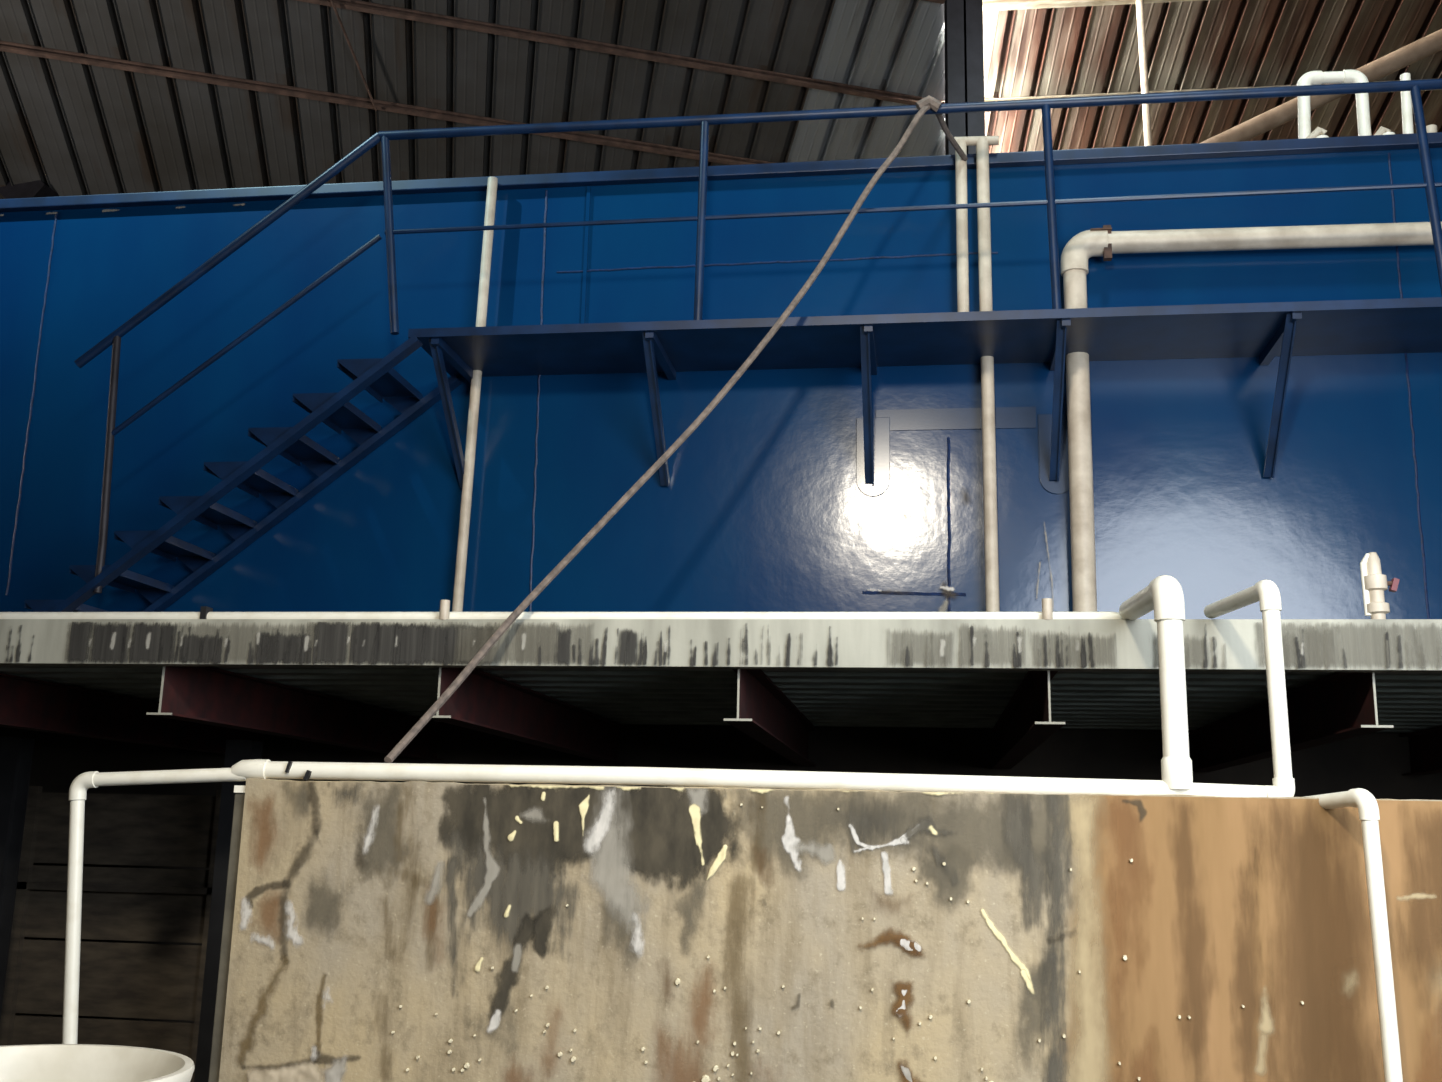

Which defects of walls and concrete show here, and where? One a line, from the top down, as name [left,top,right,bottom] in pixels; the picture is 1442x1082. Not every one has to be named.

damp [67,622,670,666]
damp [690,624,838,666]
damp [892,626,1115,668]
damp [1184,633,1226,668]
damp [1256,622,1266,664]
damp [1282,623,1442,668]
peeling [579,795,589,830]
crack [239,781,360,1069]
damp [427,784,1105,1082]
rust [1075,795,1385,1082]
rust [1376,800,1442,1082]
spalling [898,1062,920,1082]